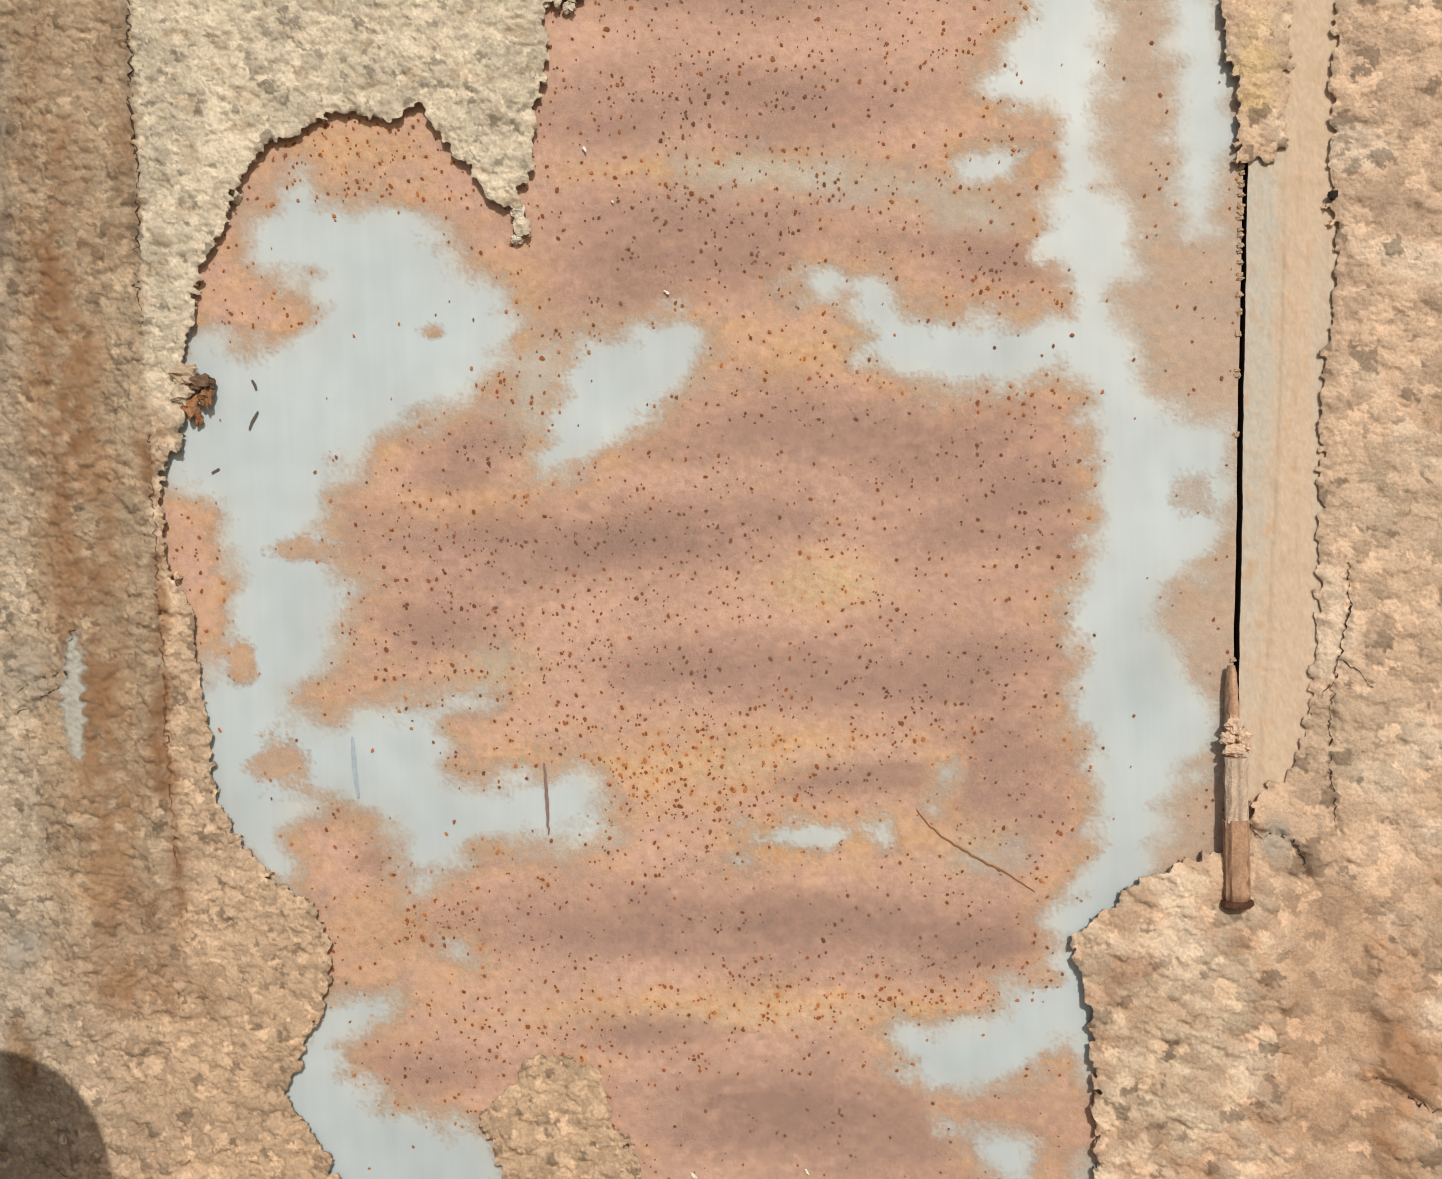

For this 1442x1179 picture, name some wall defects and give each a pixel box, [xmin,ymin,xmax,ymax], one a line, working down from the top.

flaking render [531,0,580,111]
flaking render [1219,0,1289,166]
corrosion [1097,0,1243,427]
corrosion [158,485,260,684]
flaking render [157,110,351,1179]
corrosion [192,0,1106,1179]
corrosion [1160,506,1237,715]
crack [1309,562,1374,820]
corrosion [1157,751,1225,874]
flaking render [1070,850,1223,1023]
flaking render [1088,1040,1103,1175]
crack [1374,1076,1437,1113]